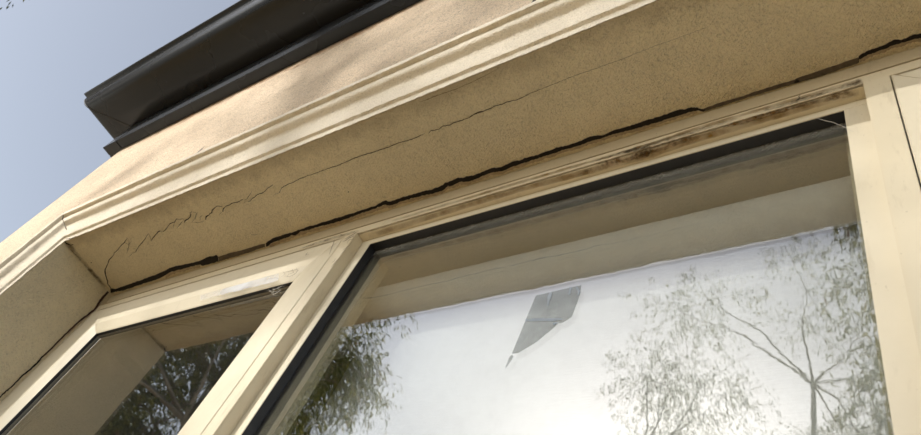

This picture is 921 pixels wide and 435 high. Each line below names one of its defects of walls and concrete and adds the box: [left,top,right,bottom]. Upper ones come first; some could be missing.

crack [109,34,921,293]
crack [104,238,131,284]
crack [0,291,109,398]